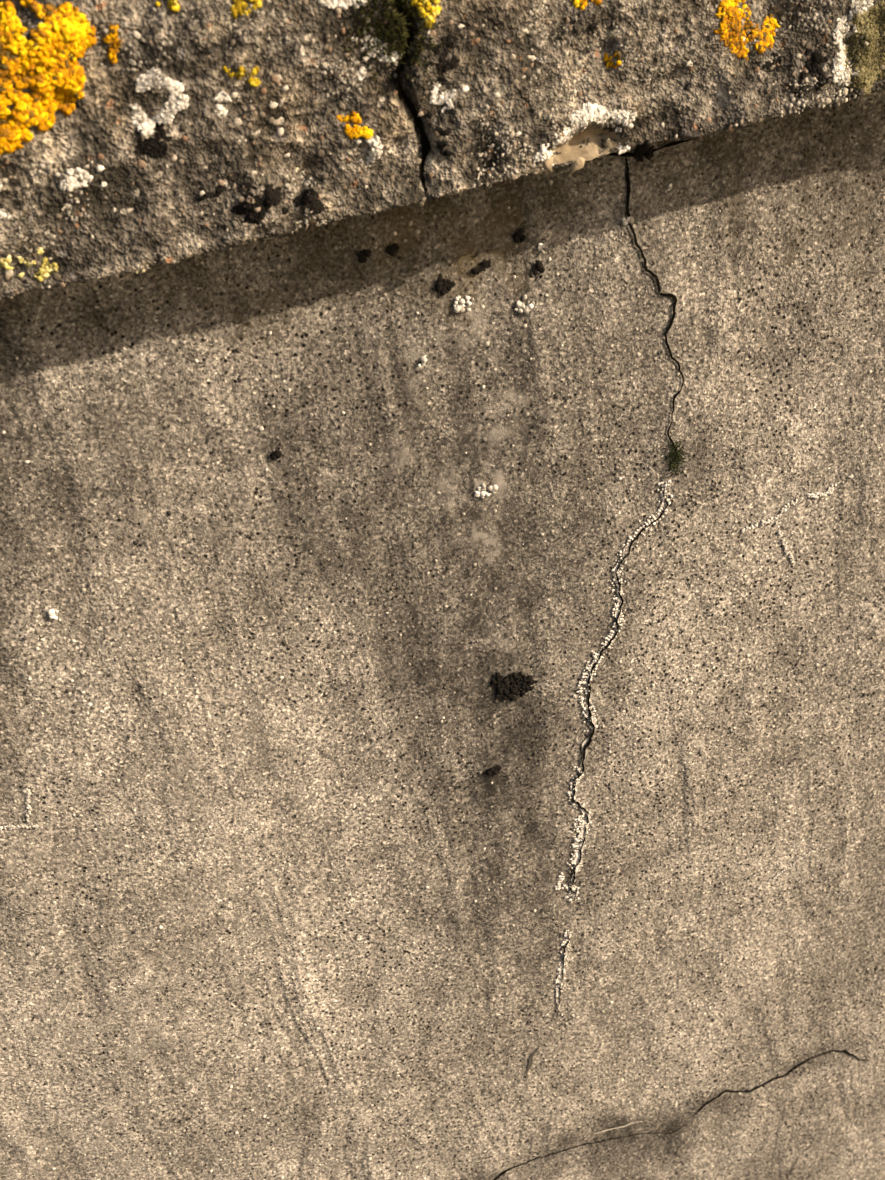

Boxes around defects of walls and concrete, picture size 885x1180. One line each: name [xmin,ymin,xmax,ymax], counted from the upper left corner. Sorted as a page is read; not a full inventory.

crack [341,0,443,195]
crack [554,139,697,902]
crack [554,930,572,1024]
crack [494,1046,872,1180]